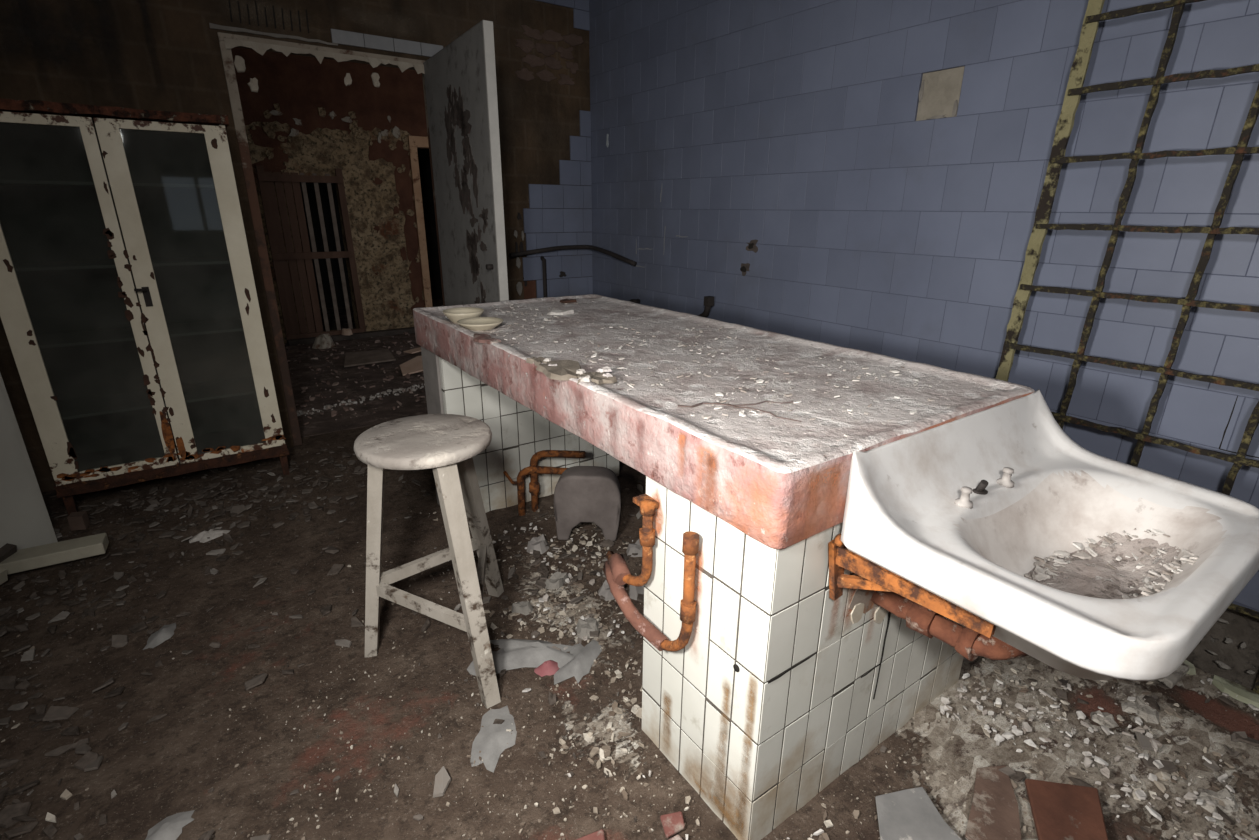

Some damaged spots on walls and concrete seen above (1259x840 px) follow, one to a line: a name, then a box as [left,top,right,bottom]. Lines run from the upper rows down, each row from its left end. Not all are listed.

peeling [224,38,428,318]
peeling [916,66,965,121]